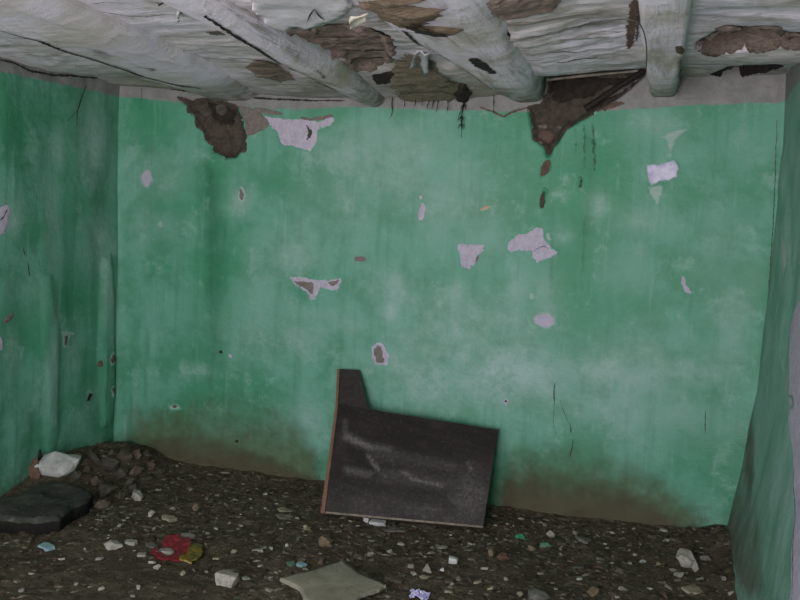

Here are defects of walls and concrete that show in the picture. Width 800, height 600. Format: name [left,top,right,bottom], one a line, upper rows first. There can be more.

crack [0,31,200,126]
crack [183,16,352,102]
flaking render [250,0,369,32]
flaking render [697,25,800,57]
flaking render [177,96,334,158]
flaking render [480,69,645,176]
peeling [646,124,694,209]
peeling [457,243,485,269]
peeling [508,226,557,263]
peeling [290,276,341,300]
water stain [130,416,314,480]
water stain [501,465,690,527]